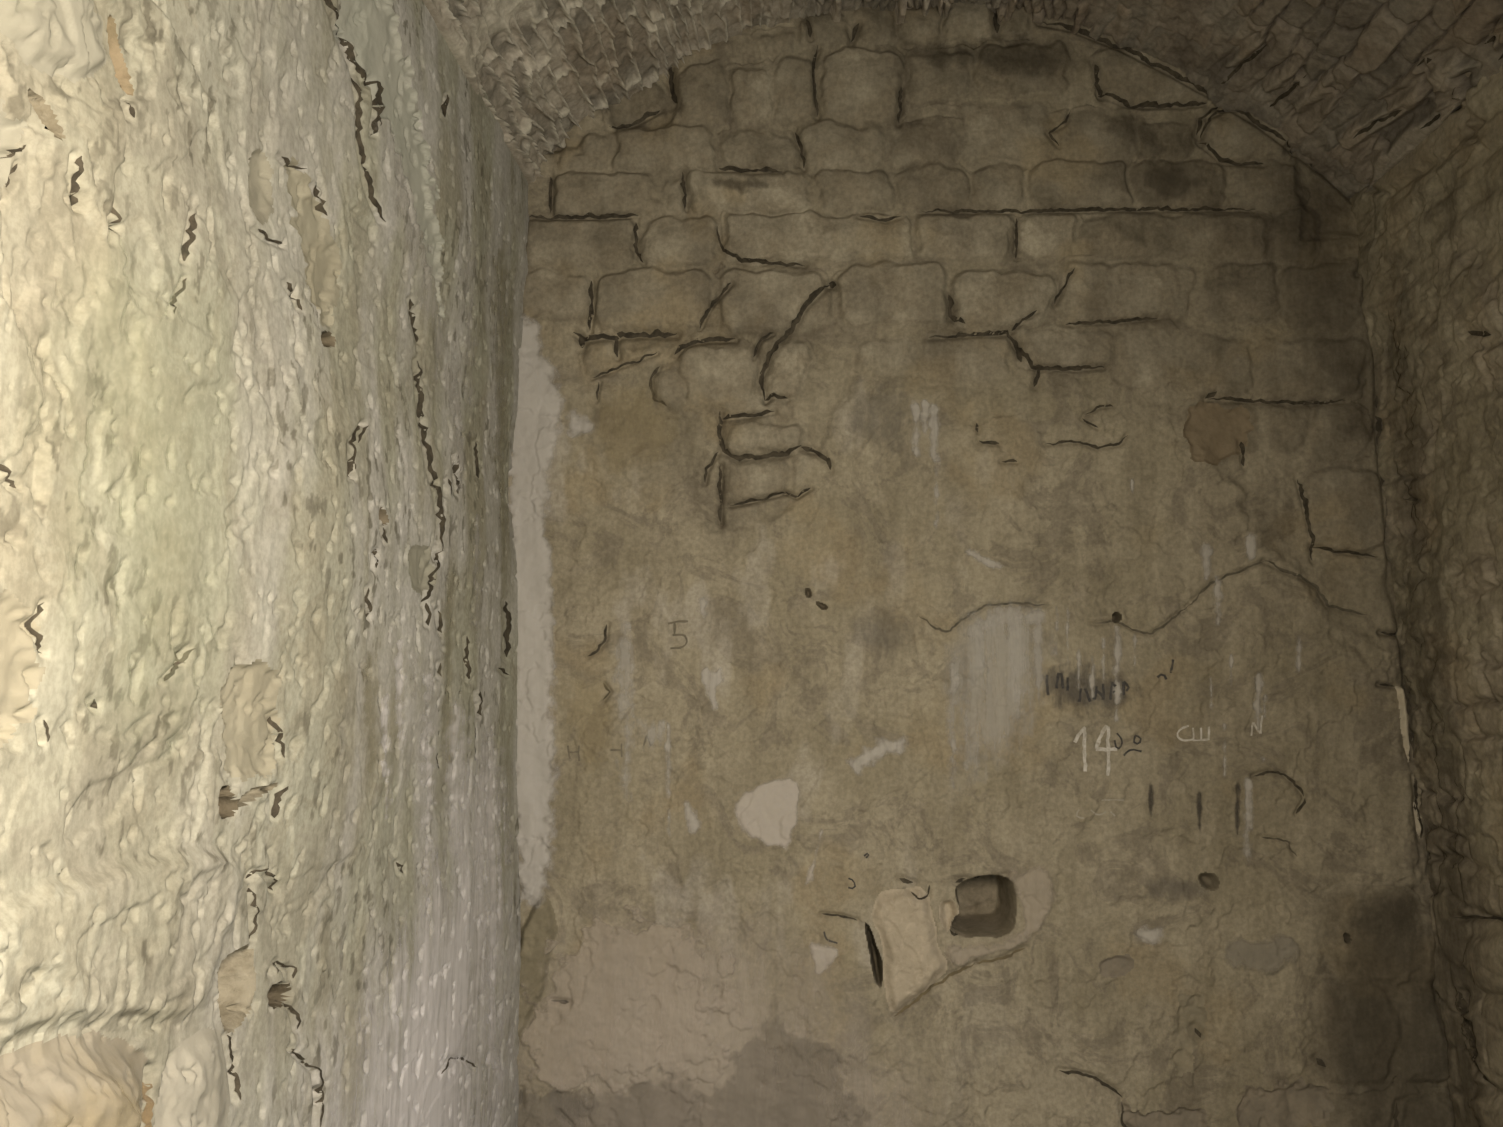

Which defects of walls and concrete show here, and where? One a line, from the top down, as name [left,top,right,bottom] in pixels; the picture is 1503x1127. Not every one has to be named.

crack [324,0,386,222]
crack [529,177,643,262]
crack [573,228,836,524]
crack [932,268,1157,387]
crack [1098,480,1395,636]
crack [267,717,288,818]
leakage [366,261,593,1127]
crack [227,1035,241,1099]
crack [246,868,324,1127]
leakage [562,955,816,1127]
spalling [865,922,883,988]
spalling [939,869,1052,965]